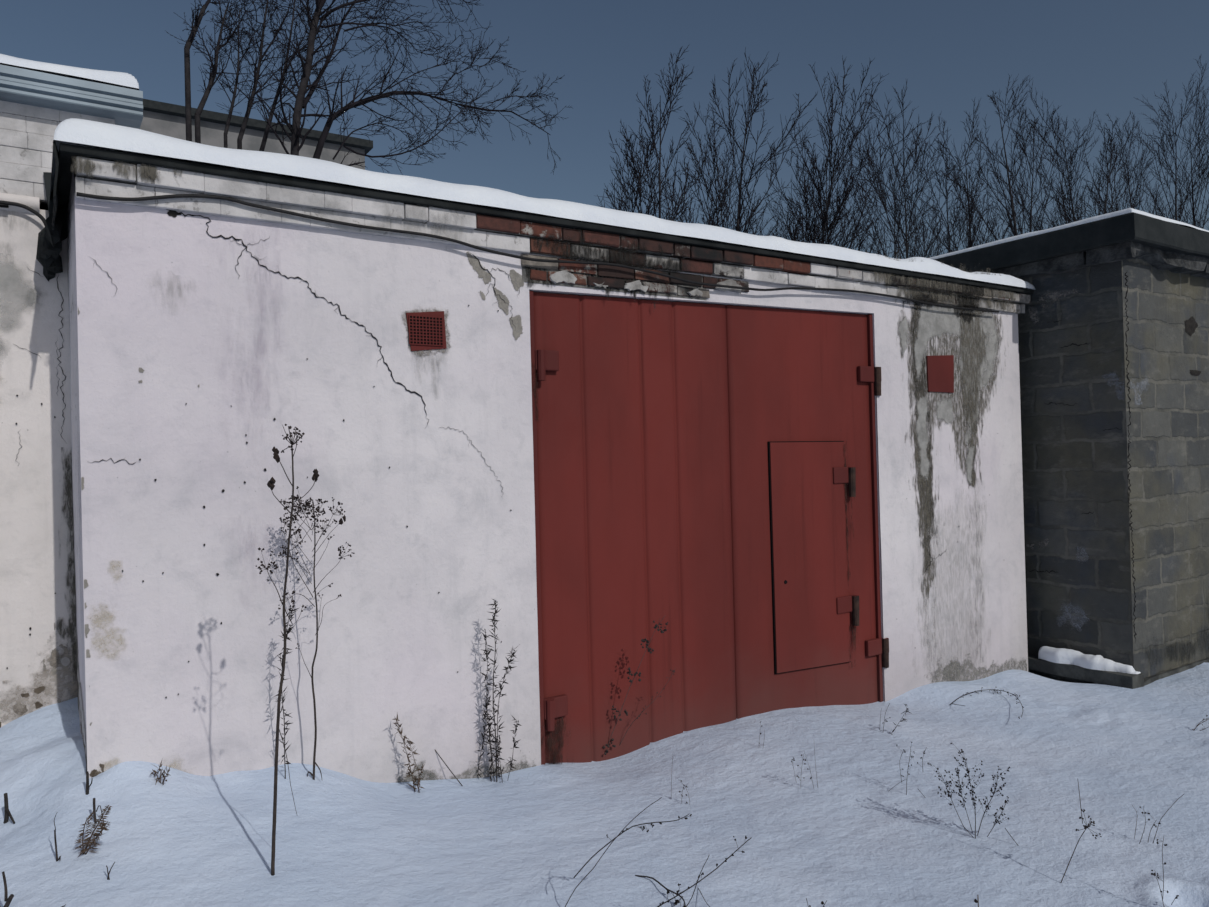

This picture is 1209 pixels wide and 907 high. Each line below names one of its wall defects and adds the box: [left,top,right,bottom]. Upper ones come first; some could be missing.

crack [14,267,140,464]
crack [139,173,504,494]
flaking render [466,252,749,340]
leakage [873,256,1015,598]
leakage [0,447,86,759]